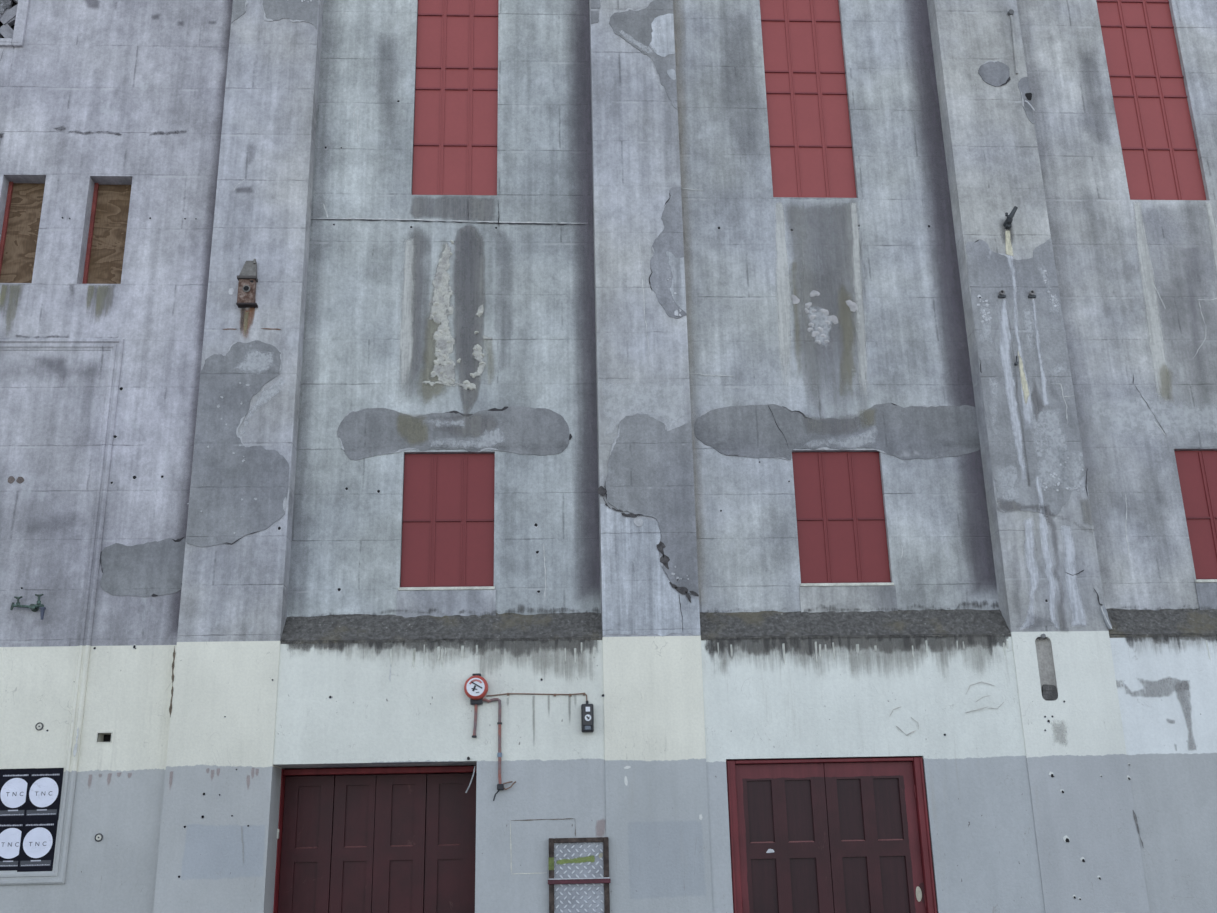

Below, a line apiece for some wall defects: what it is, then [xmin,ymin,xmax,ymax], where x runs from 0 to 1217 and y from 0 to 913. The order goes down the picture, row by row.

flaking render [609,0,678,111]
water stain [400,196,496,436]
flaking render [649,187,687,319]
water stain [776,203,838,362]
water stain [845,203,867,381]
water stain [1000,231,1048,471]
flaking render [186,340,289,547]
flaking render [598,414,700,636]
water stain [998,478,1085,630]
water stain [289,637,597,666]
water stain [1127,633,1217,658]